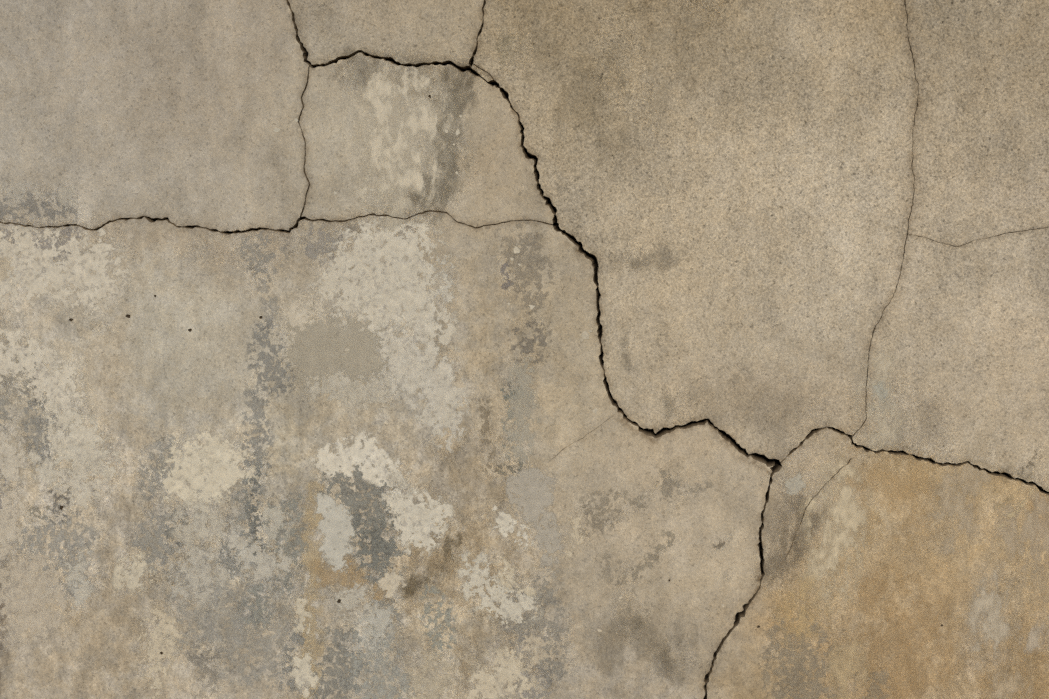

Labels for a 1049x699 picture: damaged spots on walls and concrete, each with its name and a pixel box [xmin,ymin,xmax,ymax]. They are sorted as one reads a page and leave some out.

crack [0,0,782,699]
crack [785,458,853,559]
crack [780,414,1049,495]
crack [866,0,1048,405]